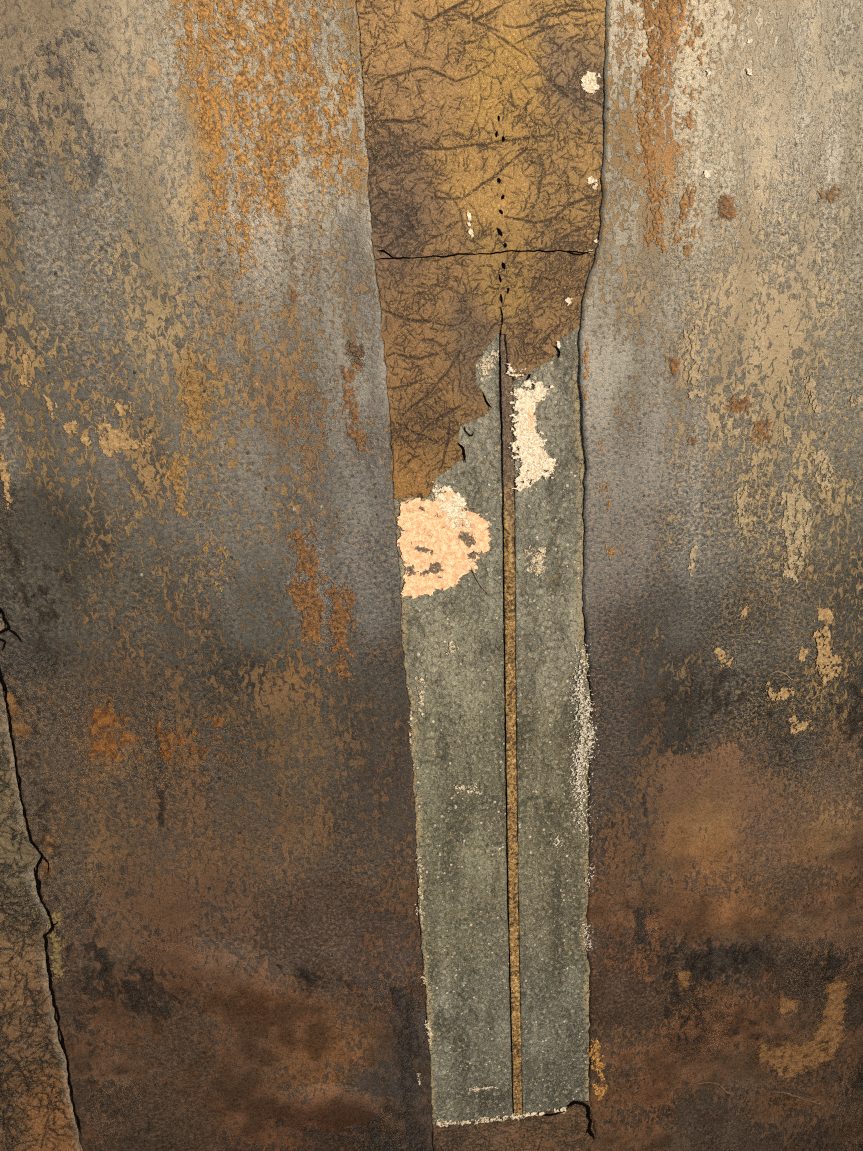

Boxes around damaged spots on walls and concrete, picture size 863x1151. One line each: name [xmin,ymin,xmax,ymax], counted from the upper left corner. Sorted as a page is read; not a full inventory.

corrosion [179,0,361,277]
corrosion [620,0,742,267]
corrosion [339,364,369,457]
peeling [476,350,559,492]
corrosion [283,529,358,682]
peeling [397,479,492,599]
crack [377,178,597,1114]
peeling [524,545,546,576]
peeling [766,681,795,701]
peeling [796,608,842,683]
crack [0,607,82,1135]
crack [542,1101,595,1140]